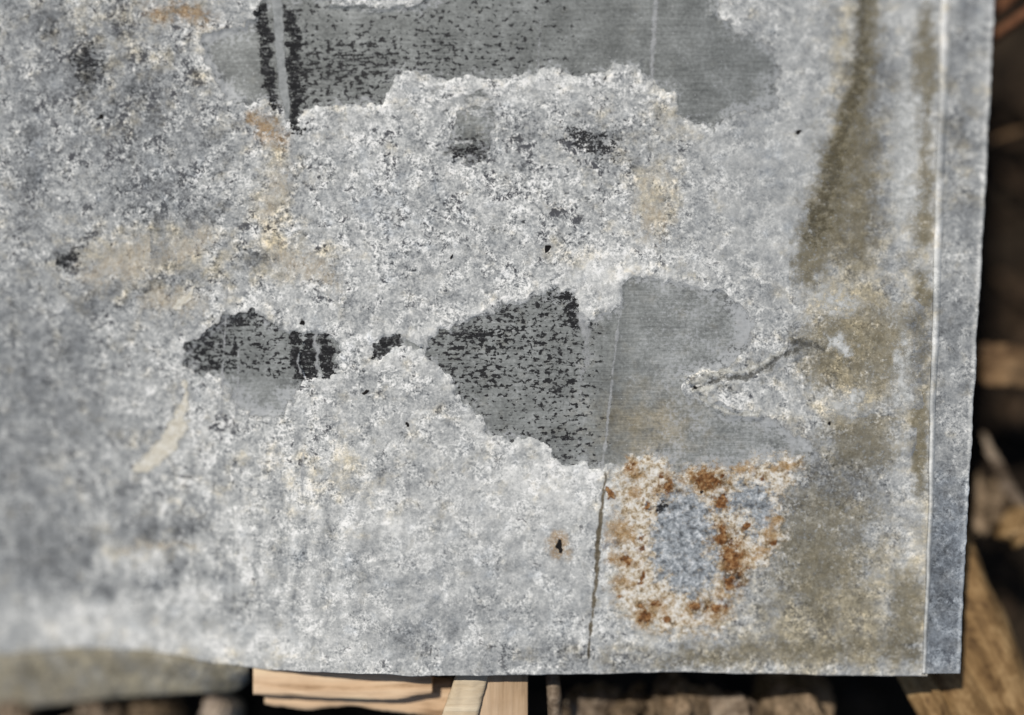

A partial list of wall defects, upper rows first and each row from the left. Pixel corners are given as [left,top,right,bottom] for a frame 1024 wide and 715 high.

peeling [200,0,781,167]
water stain [792,0,877,315]
water stain [889,15,937,245]
peeling [182,307,341,418]
peeling [371,275,823,478]
crack [685,343,825,417]
crack [587,474,607,657]
corrosion [605,449,805,642]